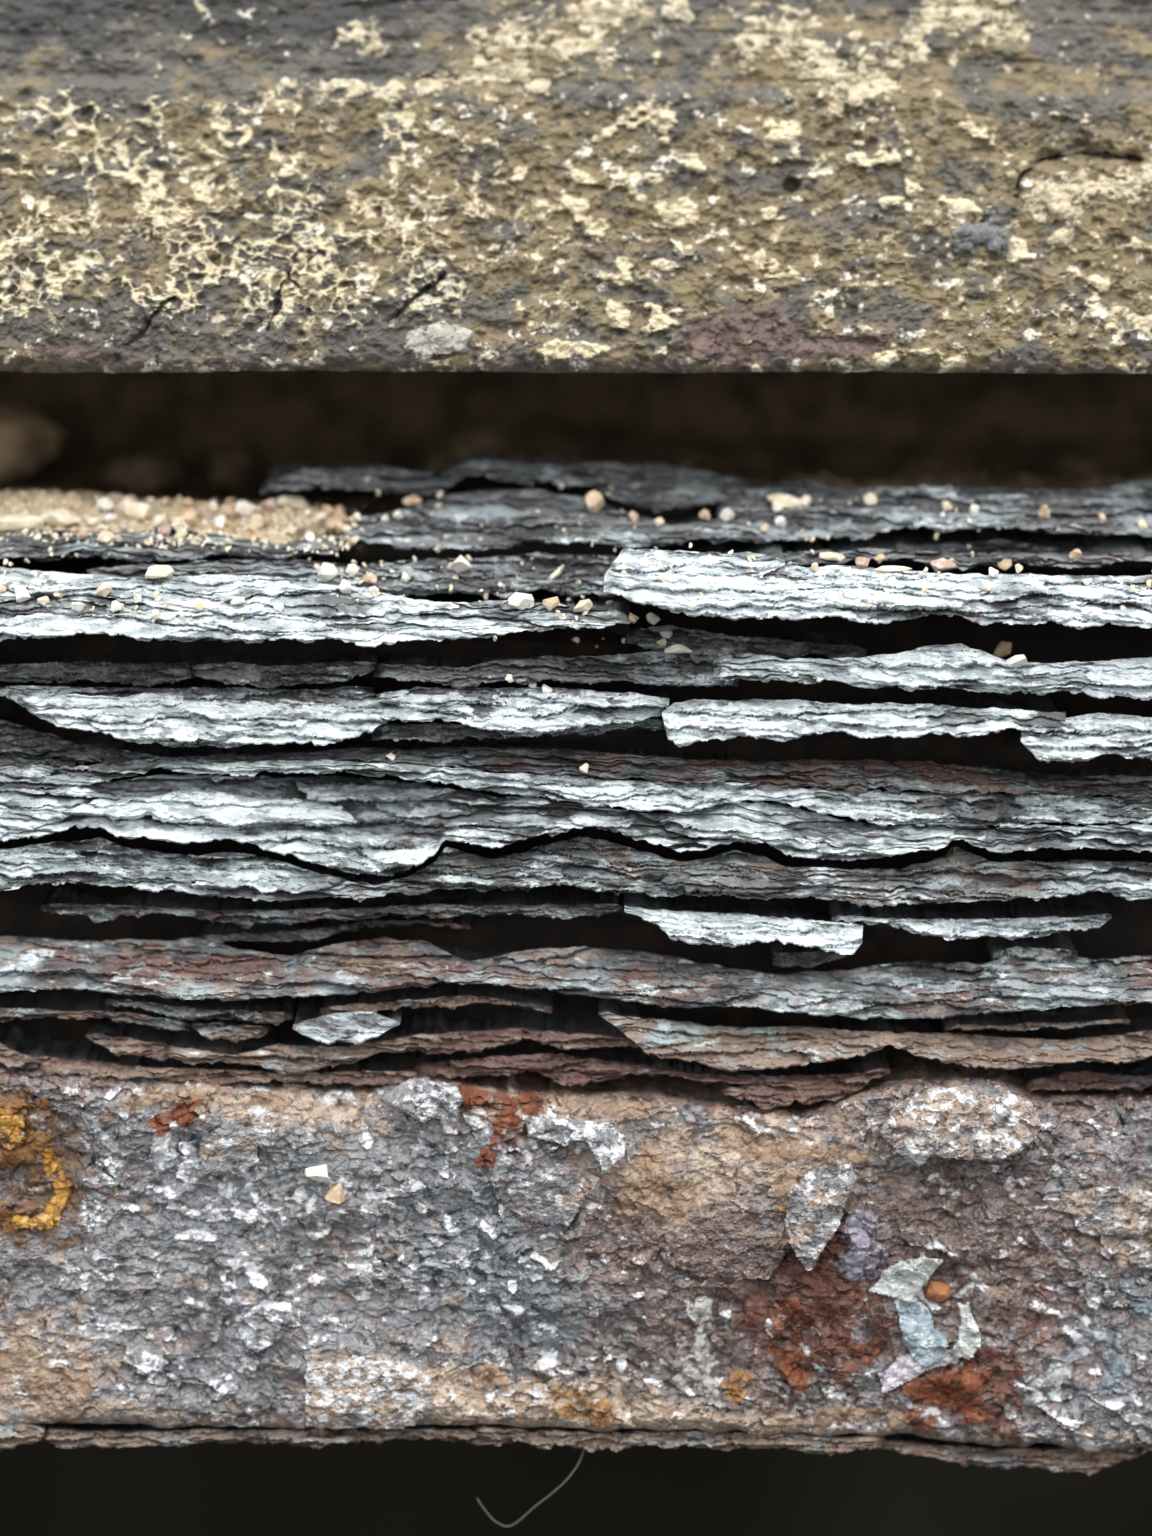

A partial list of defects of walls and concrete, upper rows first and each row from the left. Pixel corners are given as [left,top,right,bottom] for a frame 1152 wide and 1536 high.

spalling [0,502,81,531]
spalling [235,501,257,517]
spalling [584,490,604,512]
spalling [767,493,809,510]
spalling [145,565,174,579]
spalling [819,552,845,560]
spalling [930,558,956,573]
spalling [508,565,593,612]
spalling [664,644,692,654]
spalling [993,641,1027,668]
corrosion [0,450,1152,1251]
corrosion [0,1220,1152,1476]